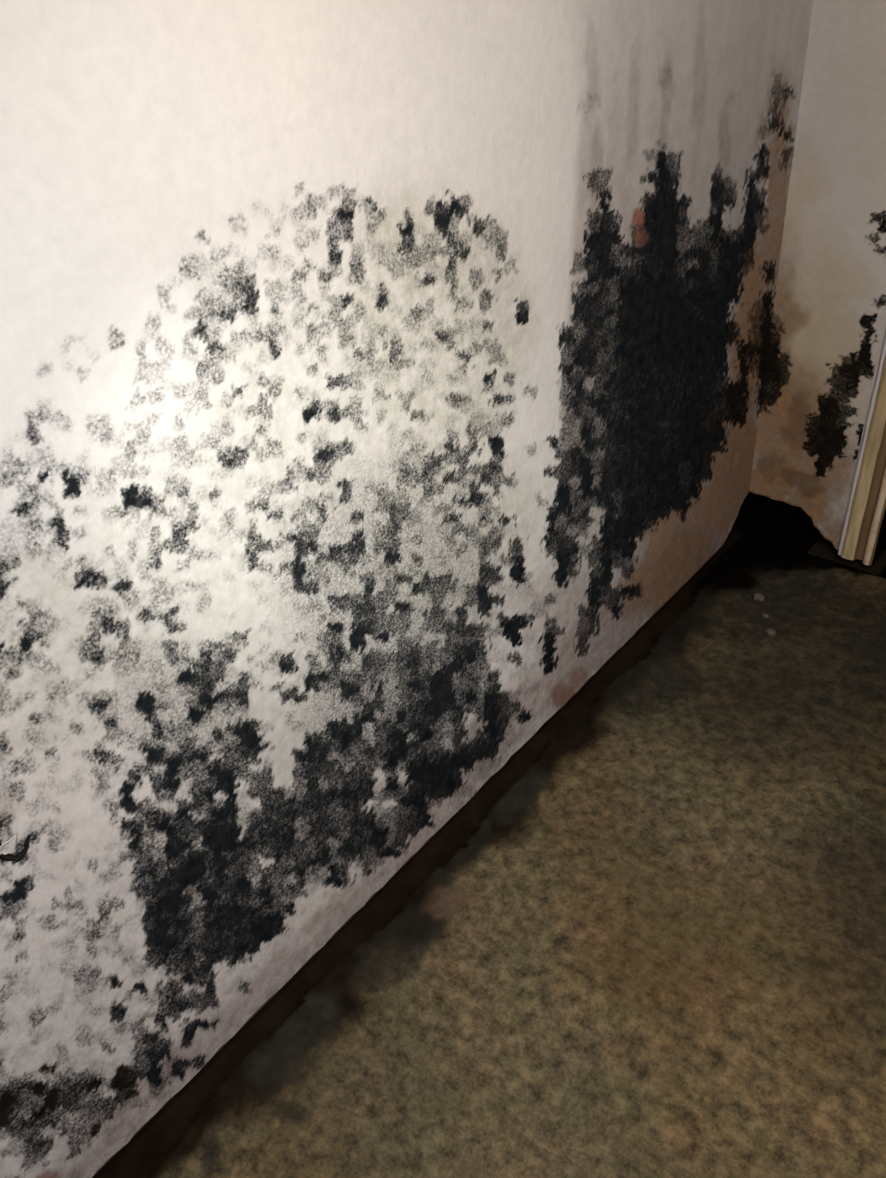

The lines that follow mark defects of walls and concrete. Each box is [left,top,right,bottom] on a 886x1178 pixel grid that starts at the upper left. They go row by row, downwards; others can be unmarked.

leakage [0,322,535,1178]
leakage [142,82,886,1178]
flaking render [724,490,837,552]